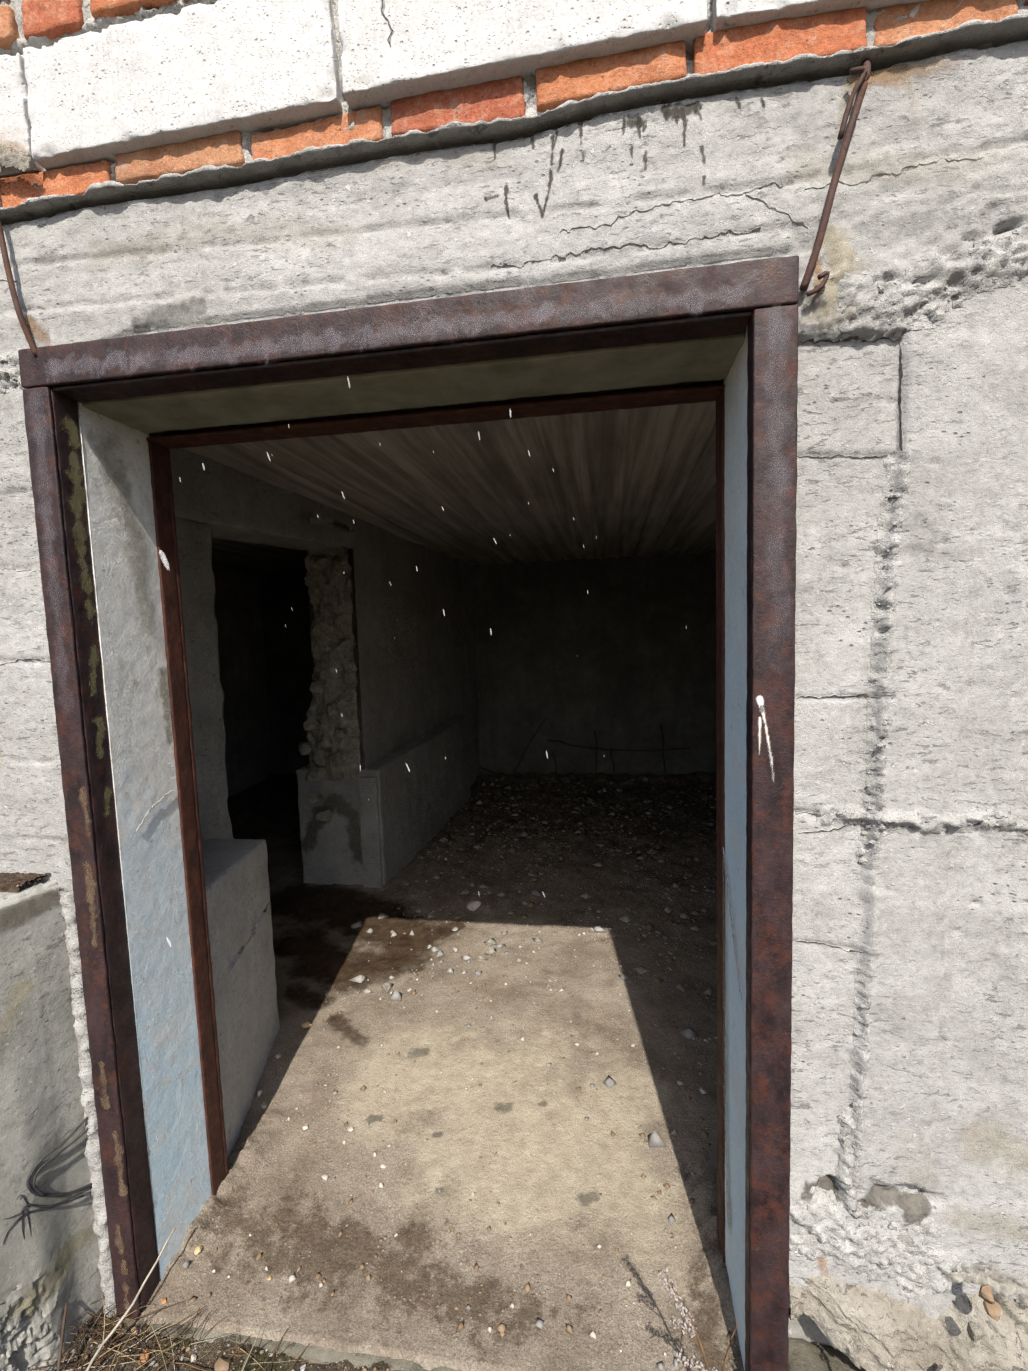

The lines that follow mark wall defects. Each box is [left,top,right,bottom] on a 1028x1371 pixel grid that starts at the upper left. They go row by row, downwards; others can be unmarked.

crack [381,0,395,45]
leakage [458,114,603,217]
leakage [622,114,647,169]
leakage [657,80,817,184]
crack [491,157,983,268]
crack [0,657,47,665]
leakage [270,885,464,1041]
spalling [789,1174,1028,1312]